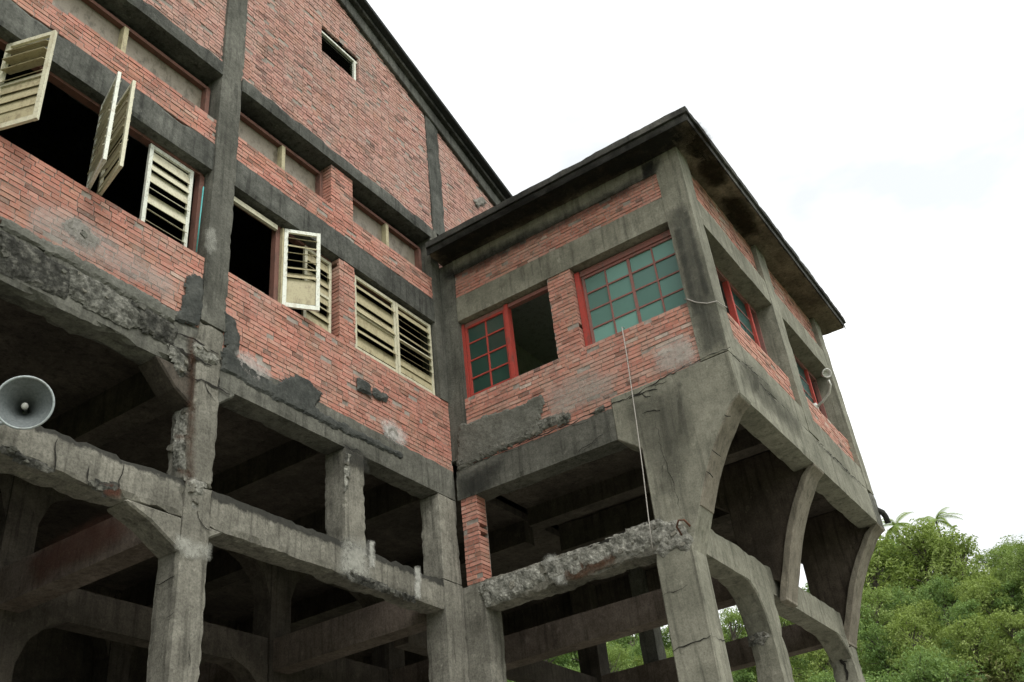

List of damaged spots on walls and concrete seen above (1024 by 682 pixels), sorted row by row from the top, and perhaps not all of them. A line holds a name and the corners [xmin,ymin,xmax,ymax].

water stain [433,123,726,277]
water stain [723,197,758,237]
spalling [0,231,219,378]
spalling [166,407,207,509]
spalling [475,412,571,457]
crack [458,347,777,512]
spalling [344,569,416,604]
spalling [478,518,694,607]